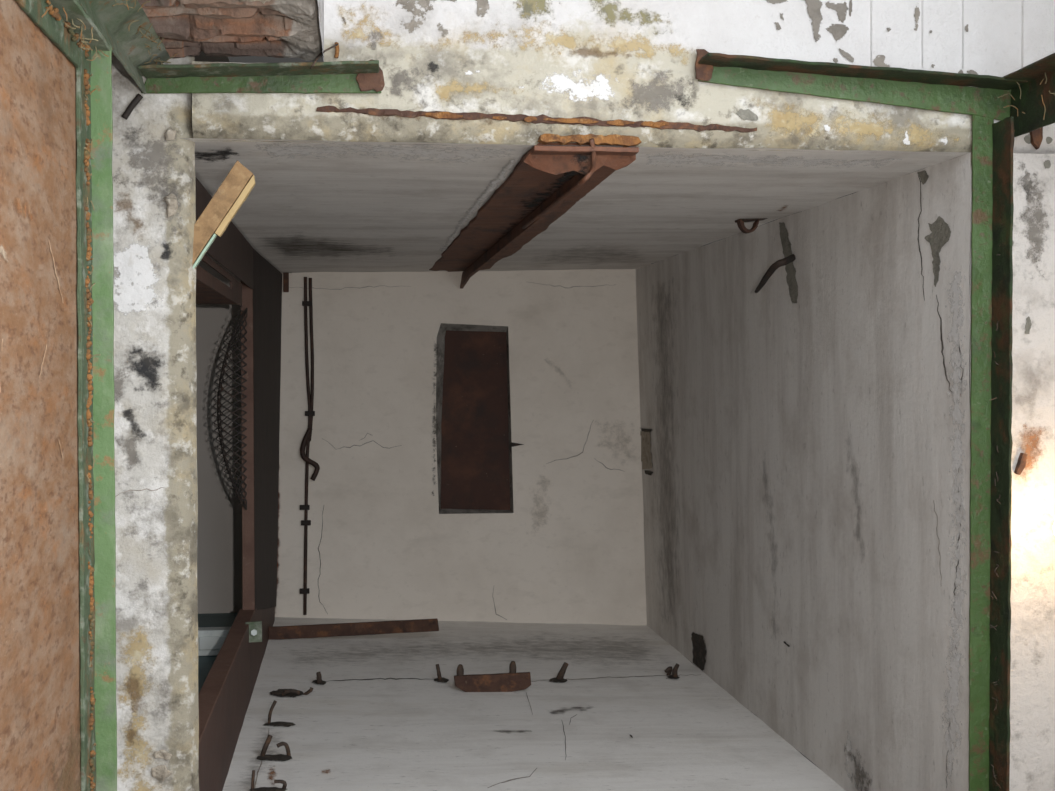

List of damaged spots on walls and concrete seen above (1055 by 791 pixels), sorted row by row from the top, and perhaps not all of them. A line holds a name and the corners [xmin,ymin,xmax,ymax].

peeling [396,0,457,37]
peeling [476,0,489,17]
water stain [463,0,687,64]
peeling [766,0,788,30]
peeling [805,0,854,63]
water stain [390,62,439,96]
water stain [542,71,694,113]
rust [523,143,636,175]
water stain [1018,164,1048,267]
flaking render [925,216,951,287]
water stain [117,409,145,469]
water stain [118,632,155,791]